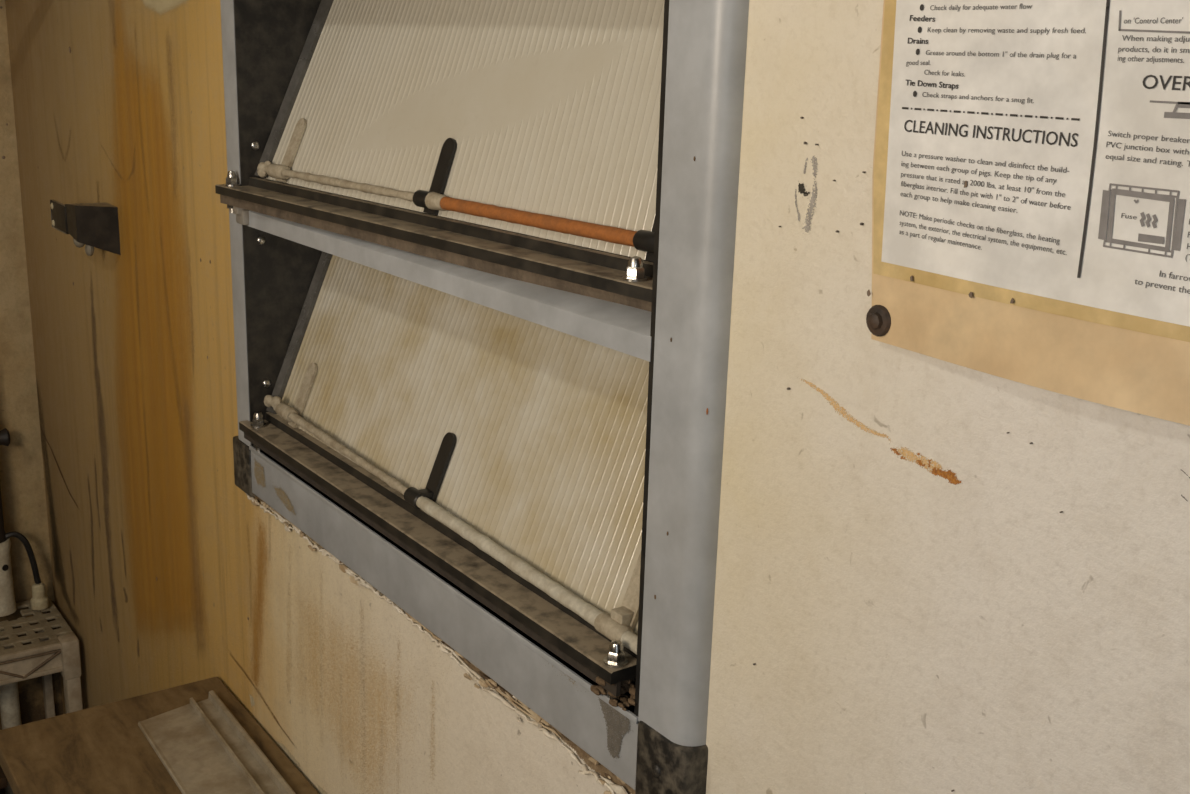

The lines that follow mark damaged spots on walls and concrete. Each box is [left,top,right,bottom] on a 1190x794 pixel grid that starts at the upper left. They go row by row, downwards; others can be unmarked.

leakage [36,374,80,624]
leakage [88,0,219,680]
spalling [246,494,635,794]
corrosion [801,379,961,485]